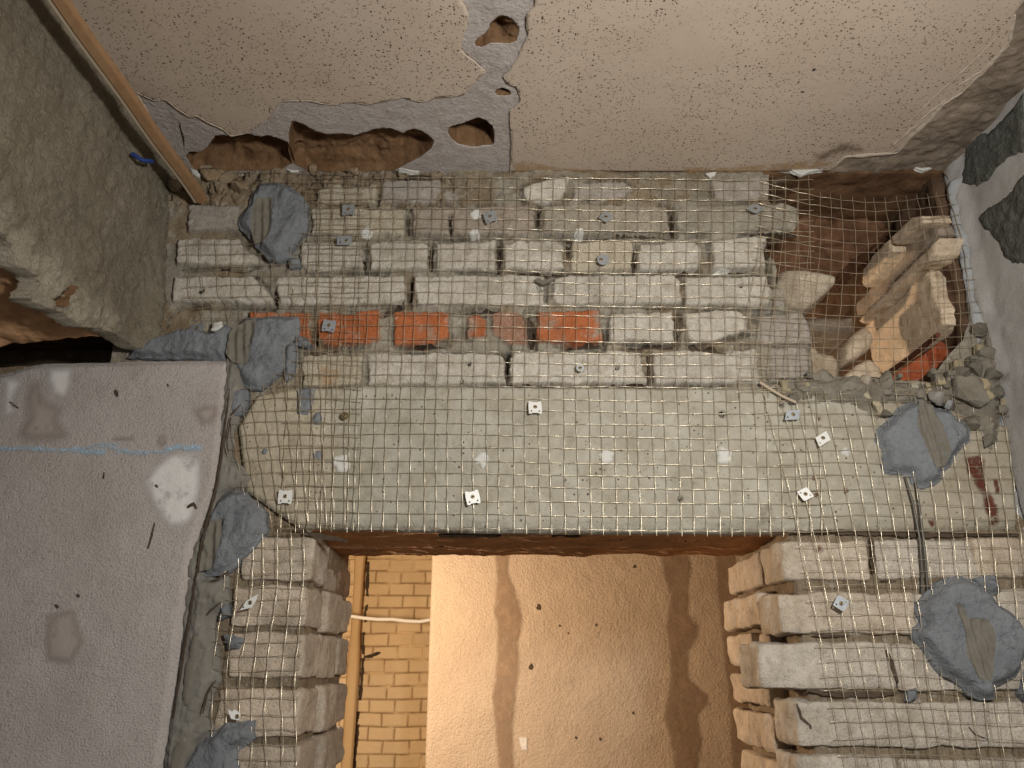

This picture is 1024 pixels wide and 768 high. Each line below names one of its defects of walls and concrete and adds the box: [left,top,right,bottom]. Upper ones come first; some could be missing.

peeling [136,0,535,178]
spalling [762,2,1024,381]
spalling [0,268,100,347]
water stain [493,555,527,768]
water stain [663,555,706,768]